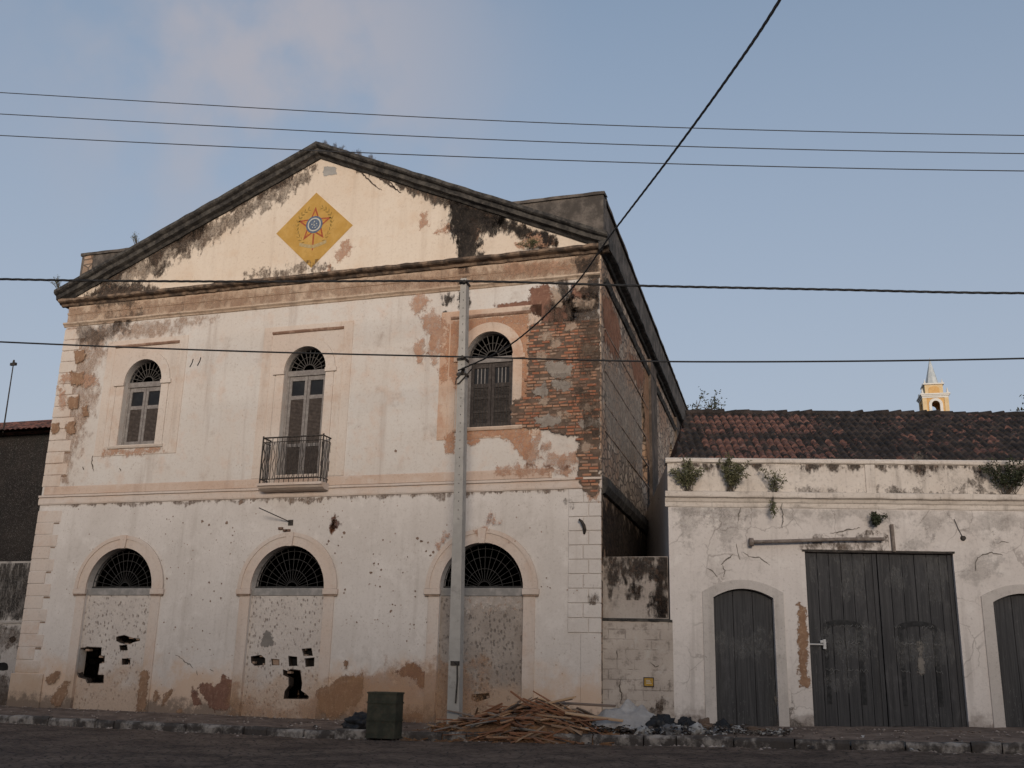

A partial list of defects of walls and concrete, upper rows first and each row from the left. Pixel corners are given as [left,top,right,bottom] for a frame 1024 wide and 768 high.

damp [51,164,600,482]
flaking render [50,349,98,435]
flaking render [410,261,650,503]
damp [682,463,762,471]
damp [801,464,860,472]
damp [875,453,996,494]
damp [588,496,668,618]
crack [707,508,768,577]
spalling [116,635,140,665]
flaking render [176,674,232,713]
flaking render [251,648,364,717]
flaking render [796,602,811,688]